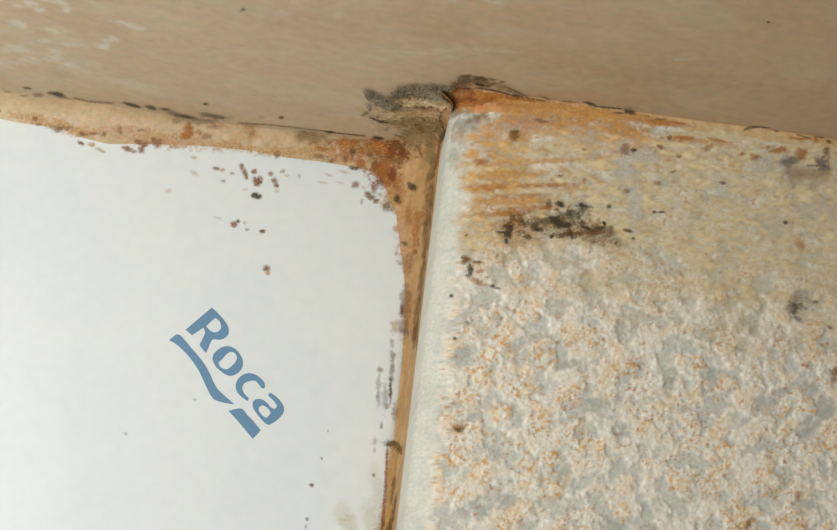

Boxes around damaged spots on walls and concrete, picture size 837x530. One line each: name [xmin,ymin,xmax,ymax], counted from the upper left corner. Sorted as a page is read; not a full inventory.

rust [446,88,550,113]
rust [313,134,417,205]
water stain [453,76,837,320]